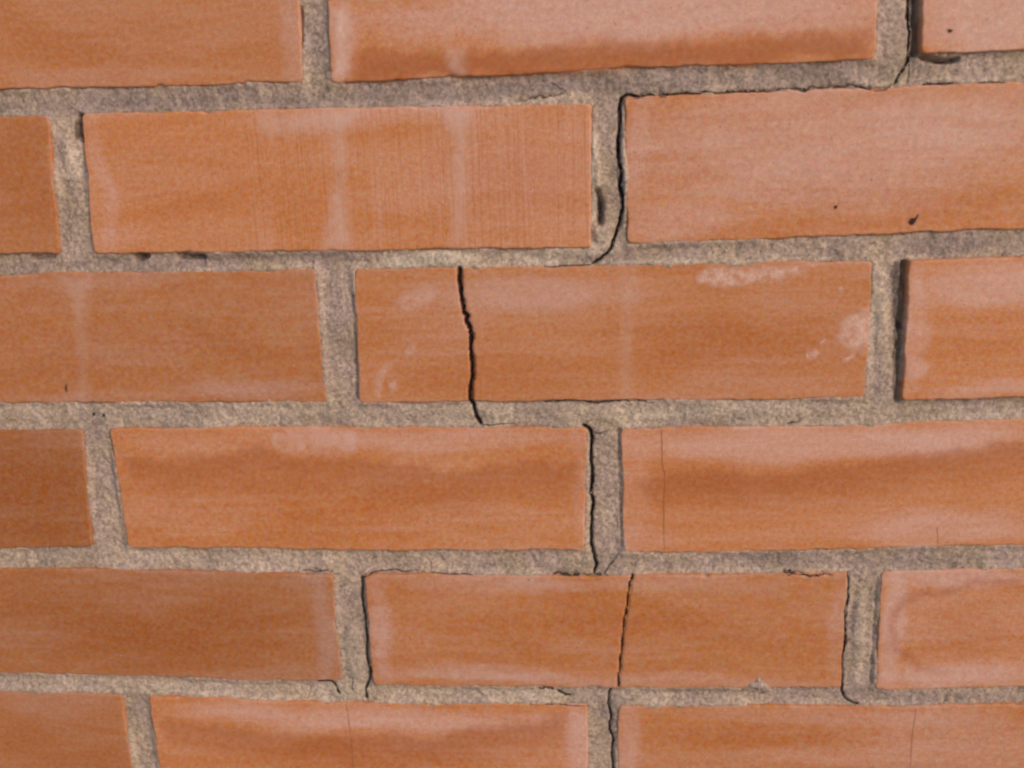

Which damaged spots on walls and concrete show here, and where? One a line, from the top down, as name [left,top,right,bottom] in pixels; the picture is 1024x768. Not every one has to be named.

crack [546,0,953,267]
crack [458,267,516,426]
crack [318,568,474,768]
crack [531,399,651,768]
crack [783,569,859,704]